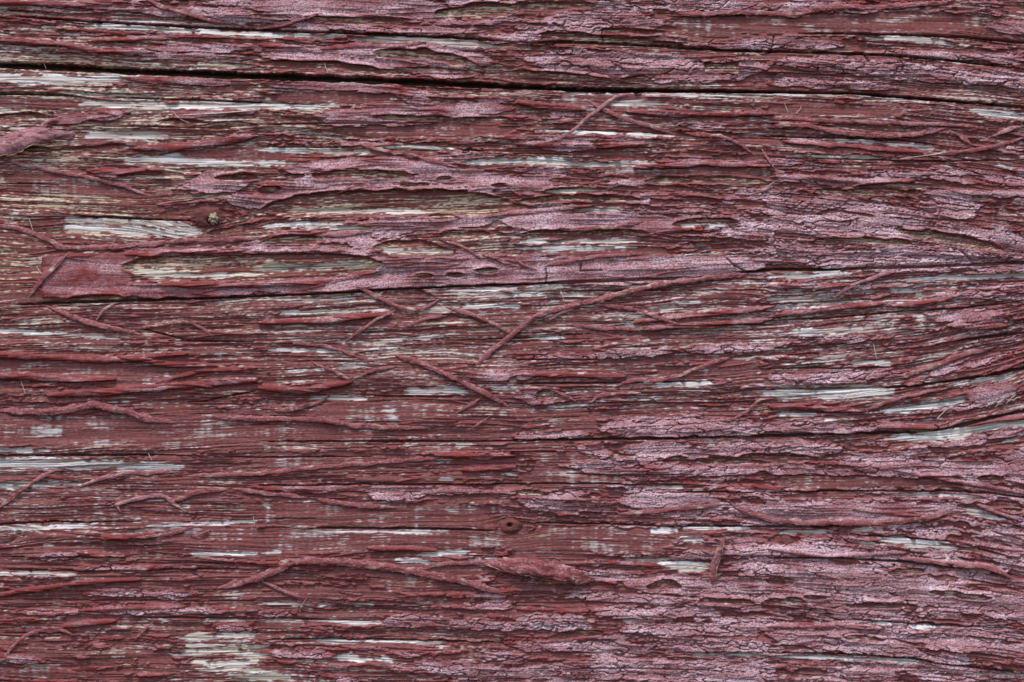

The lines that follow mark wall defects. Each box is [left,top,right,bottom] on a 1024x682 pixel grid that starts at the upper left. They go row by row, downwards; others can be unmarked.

peeling [180,87,514,120]
crack [0,63,846,103]
crack [871,95,1024,109]
peeling [24,109,257,168]
peeling [258,155,690,234]
peeling [41,214,1024,300]
crack [740,266,861,274]
crack [31,283,564,305]
peeling [763,359,1018,415]
peeling [600,416,847,457]
peeling [0,455,183,471]
peeling [0,522,97,533]